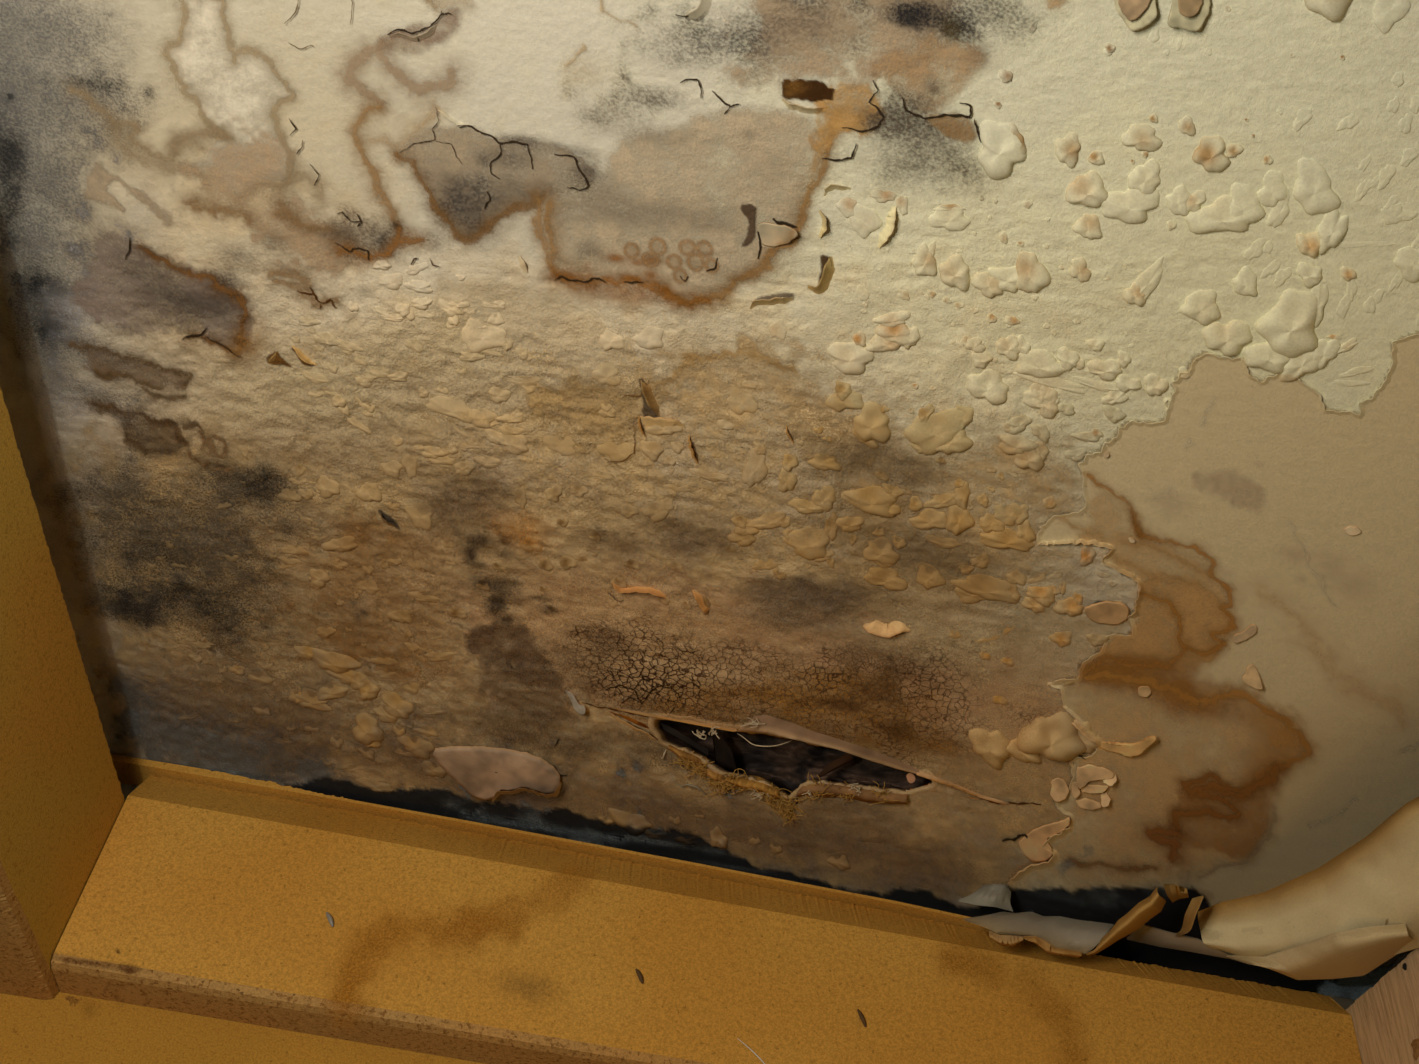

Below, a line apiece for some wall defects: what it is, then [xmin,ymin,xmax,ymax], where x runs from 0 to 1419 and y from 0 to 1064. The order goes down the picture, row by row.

peeling [782,98,826,114]
crack [399,106,589,209]
peeling [741,204,798,259]
peeling [819,184,851,238]
peeling [877,206,896,249]
peeling [750,255,835,309]
damp [0,0,1210,940]
crack [581,592,699,743]
damp [1083,474,1312,869]
peeling [1002,332,1419,980]
peeling [433,746,562,802]
damp [1087,934,1412,1000]